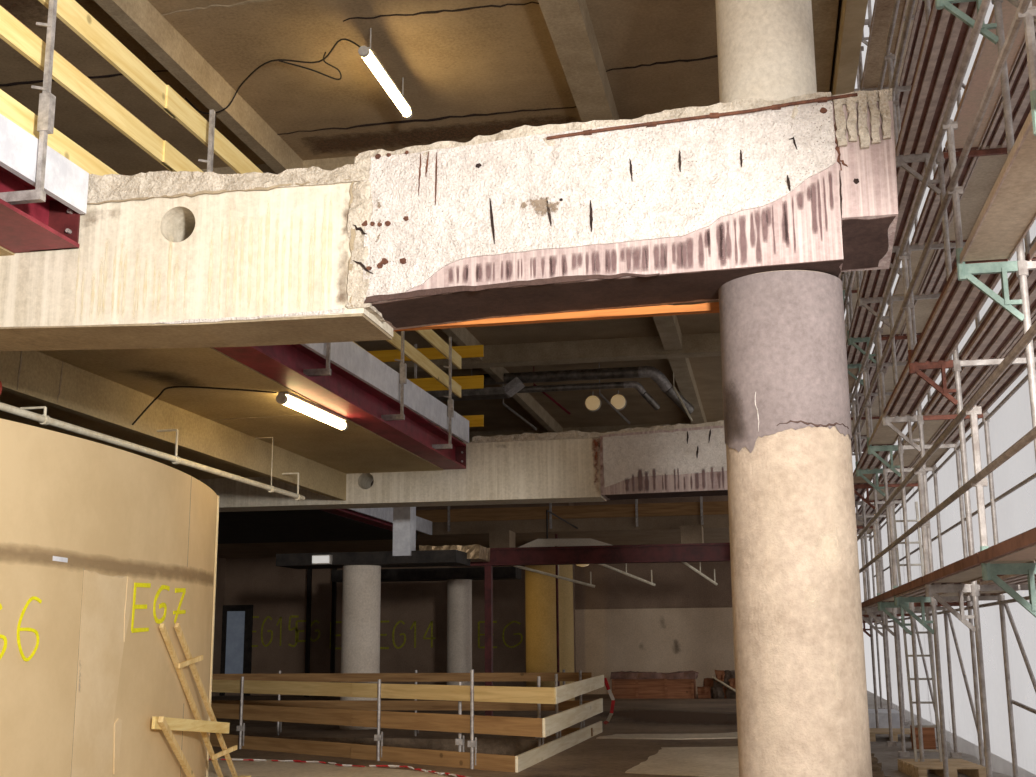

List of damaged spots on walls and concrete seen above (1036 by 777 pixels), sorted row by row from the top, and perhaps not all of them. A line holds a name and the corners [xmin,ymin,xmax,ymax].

crack [343,2,539,22]
crack [606,55,718,72]
crack [277,106,576,135]
spalling [152,92,836,324]
spalling [841,216,896,271]
rust [366,258,406,270]
spalling [603,420,727,488]
leakage [0,550,213,583]